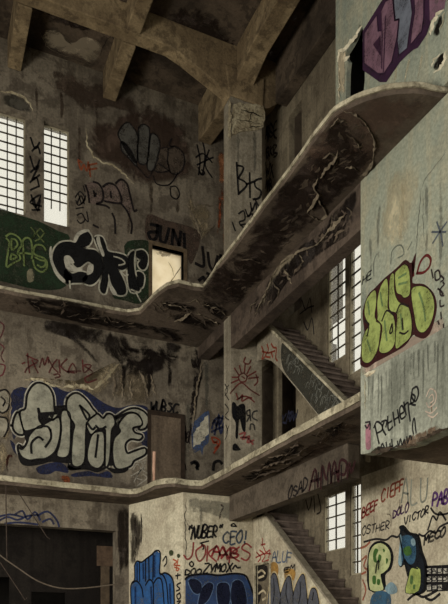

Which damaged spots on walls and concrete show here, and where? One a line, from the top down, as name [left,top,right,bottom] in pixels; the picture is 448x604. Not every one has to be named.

spalling [429,9,445,36]
spalling [337,26,362,99]
spalling [431,51,446,73]
crack [237,110,261,128]
peeling [226,110,376,316]
peeling [163,302,229,329]
water stain [27,298,185,391]
peeling [228,441,307,488]
water stain [117,508,142,571]